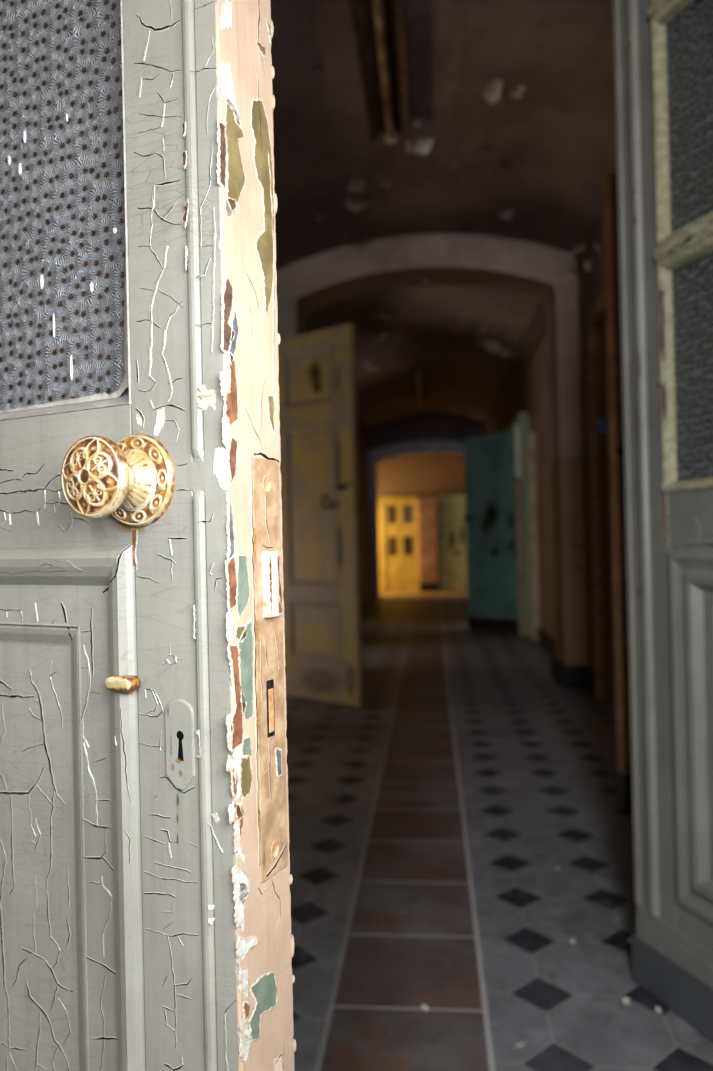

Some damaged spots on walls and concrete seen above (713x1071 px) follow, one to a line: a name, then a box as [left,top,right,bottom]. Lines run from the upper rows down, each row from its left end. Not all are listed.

peeling [219,0,233,32]
peeling [255,18,274,79]
peeling [482,79,525,104]
peeling [404,137,434,155]
peeling [216,61,278,318]
crack [134,0,218,491]
crack [0,463,90,533]
peeling [197,275,278,1066]
crack [0,514,223,1071]
peeling [275,747,283,778]
crack [224,1000,236,1071]
peeling [273,1057,284,1071]